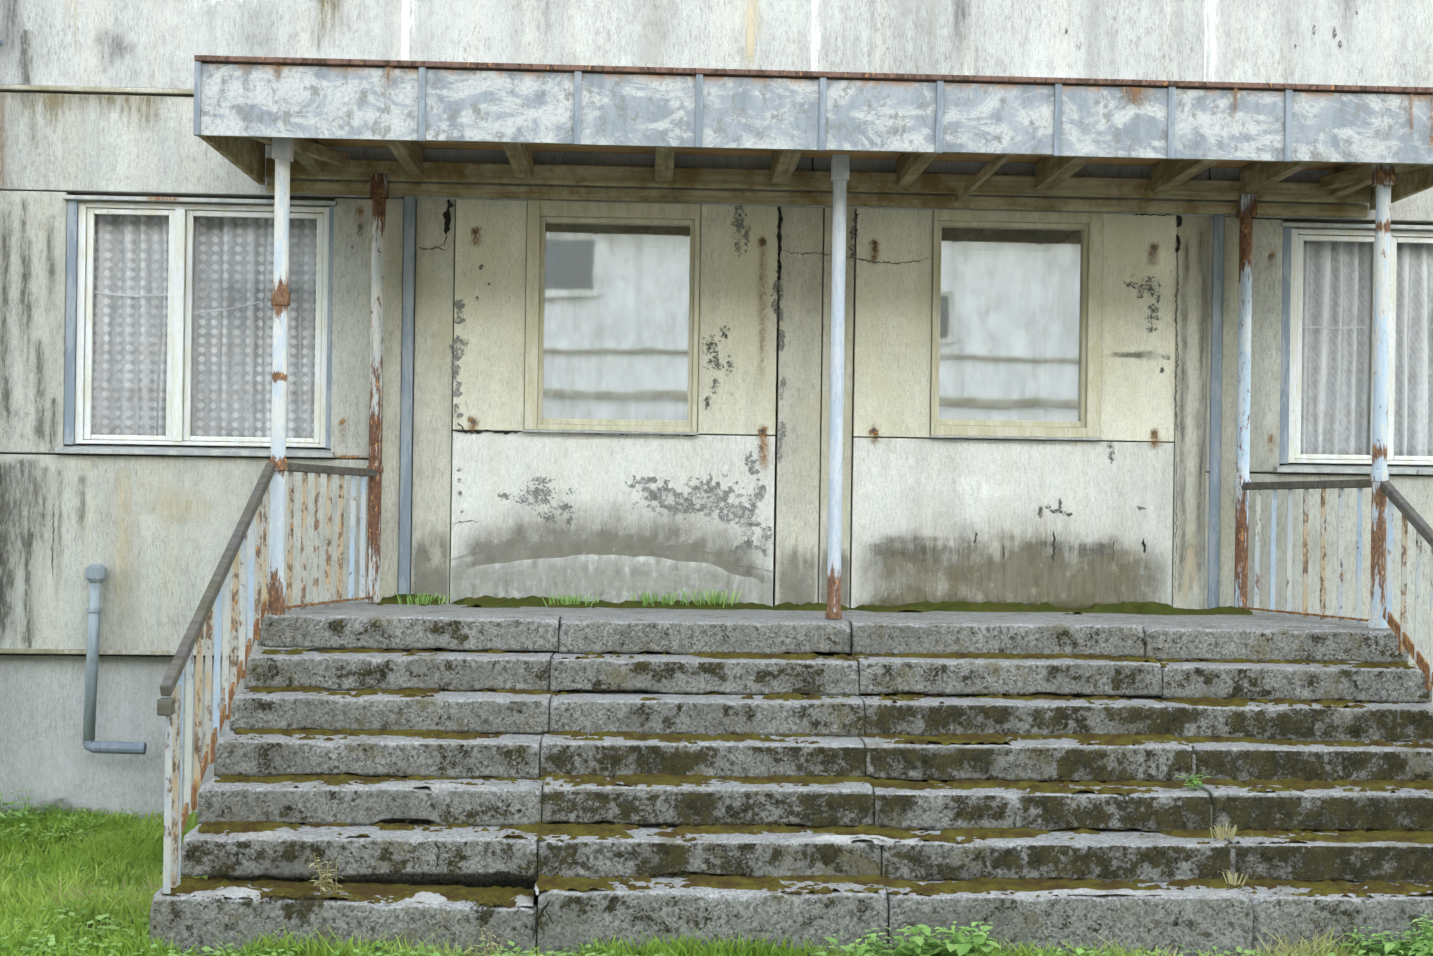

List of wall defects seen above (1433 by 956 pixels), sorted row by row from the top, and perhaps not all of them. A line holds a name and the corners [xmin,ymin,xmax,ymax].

crack [418,199,454,252]
spalling [770,270,785,351]
crack [777,206,932,353]
peeling [1124,273,1161,333]
peeling [702,326,734,410]
peeling [498,476,573,526]
peeling [625,421,786,556]
leakage [0,460,61,648]
leakage [470,526,755,578]
leakage [874,538,1155,609]